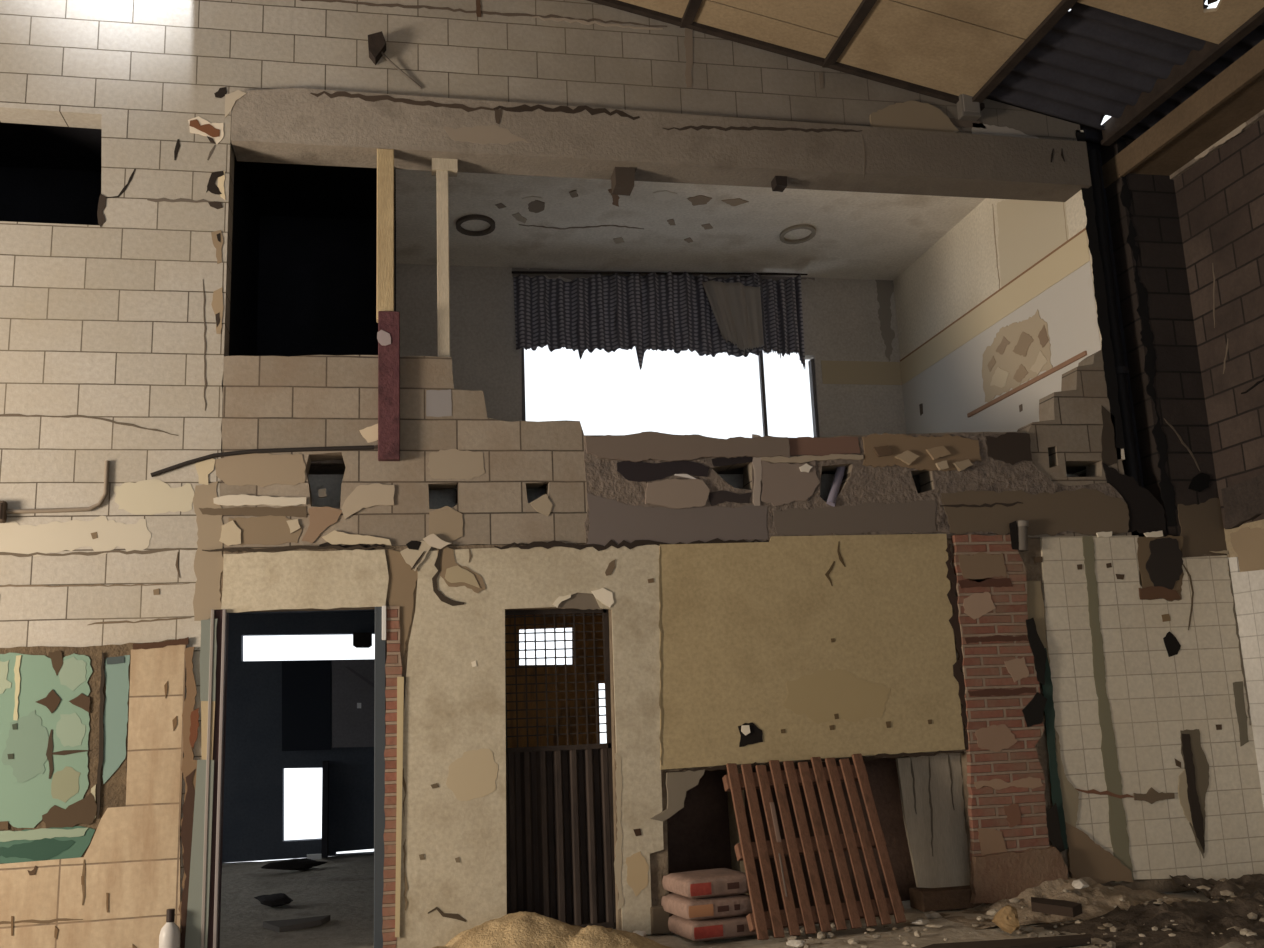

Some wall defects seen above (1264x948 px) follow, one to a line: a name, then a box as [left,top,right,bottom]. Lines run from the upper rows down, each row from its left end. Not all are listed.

crack [300,0,667,30]
spalling [188,87,247,144]
crack [310,91,862,133]
peeling [982,309,1053,402]
crack [0,414,178,436]
spalling [585,431,1033,536]
spalling [552,559,616,610]
peeling [1137,498,1230,602]
peeling [958,531,1209,884]
peeling [0,637,197,875]